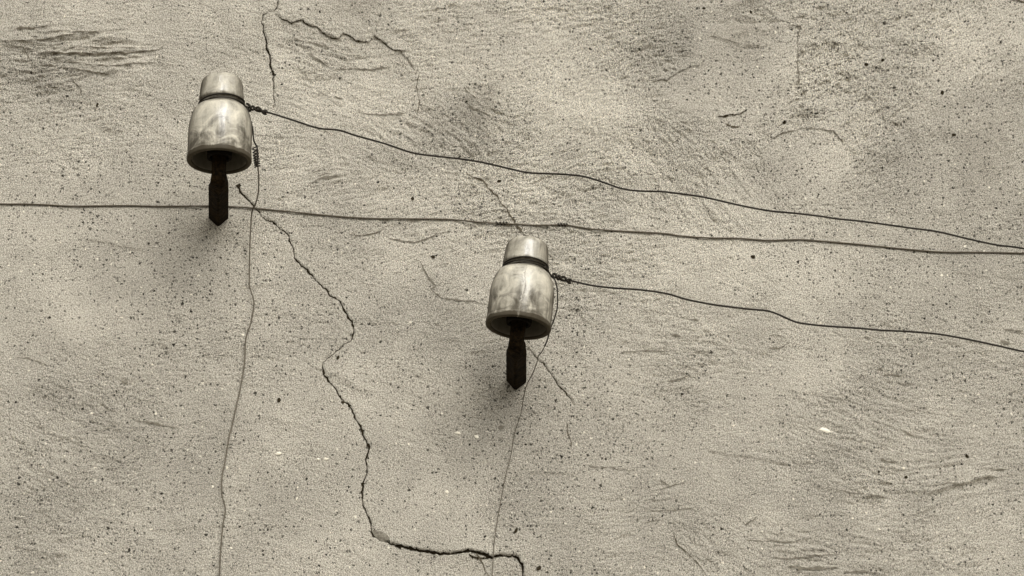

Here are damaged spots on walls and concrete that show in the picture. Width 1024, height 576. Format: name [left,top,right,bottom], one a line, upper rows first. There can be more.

crack [261,0,420,116]
crack [466,173,526,236]
crack [236,184,524,576]